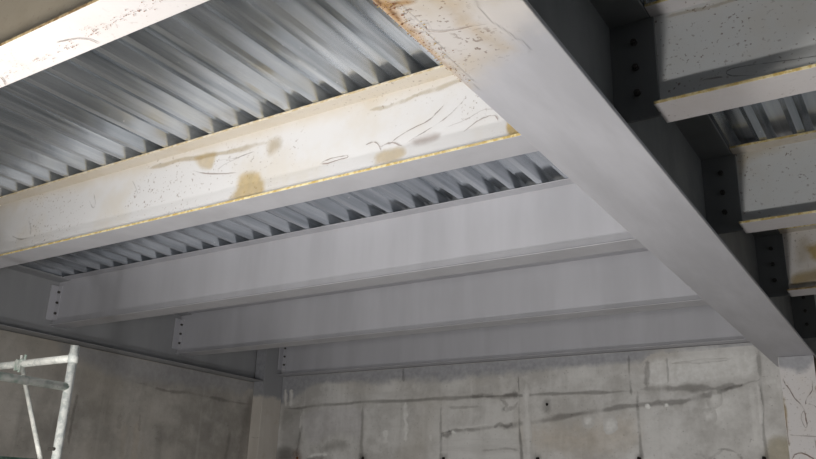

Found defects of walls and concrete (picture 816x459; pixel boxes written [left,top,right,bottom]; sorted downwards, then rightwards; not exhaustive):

corrosion [373,0,530,92]